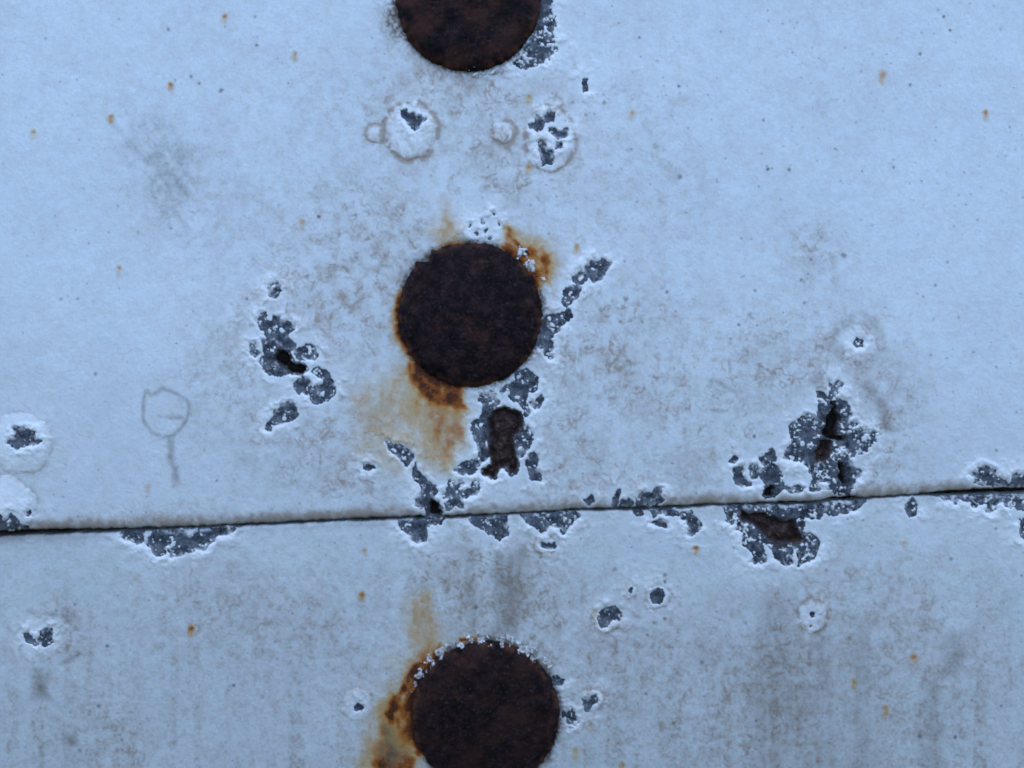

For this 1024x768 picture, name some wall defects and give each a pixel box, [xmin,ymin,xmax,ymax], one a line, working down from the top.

peeling [455,0,558,78]
peeling [528,111,569,167]
corrosion [500,226,553,290]
peeling [533,258,612,360]
peeling [249,312,336,432]
corrosion [381,289,468,466]
peeling [119,525,238,558]
peeling [385,368,595,550]
peeling [611,486,703,536]
peeling [721,380,878,568]
peeling [937,465,1024,539]
corrosion [361,594,447,768]